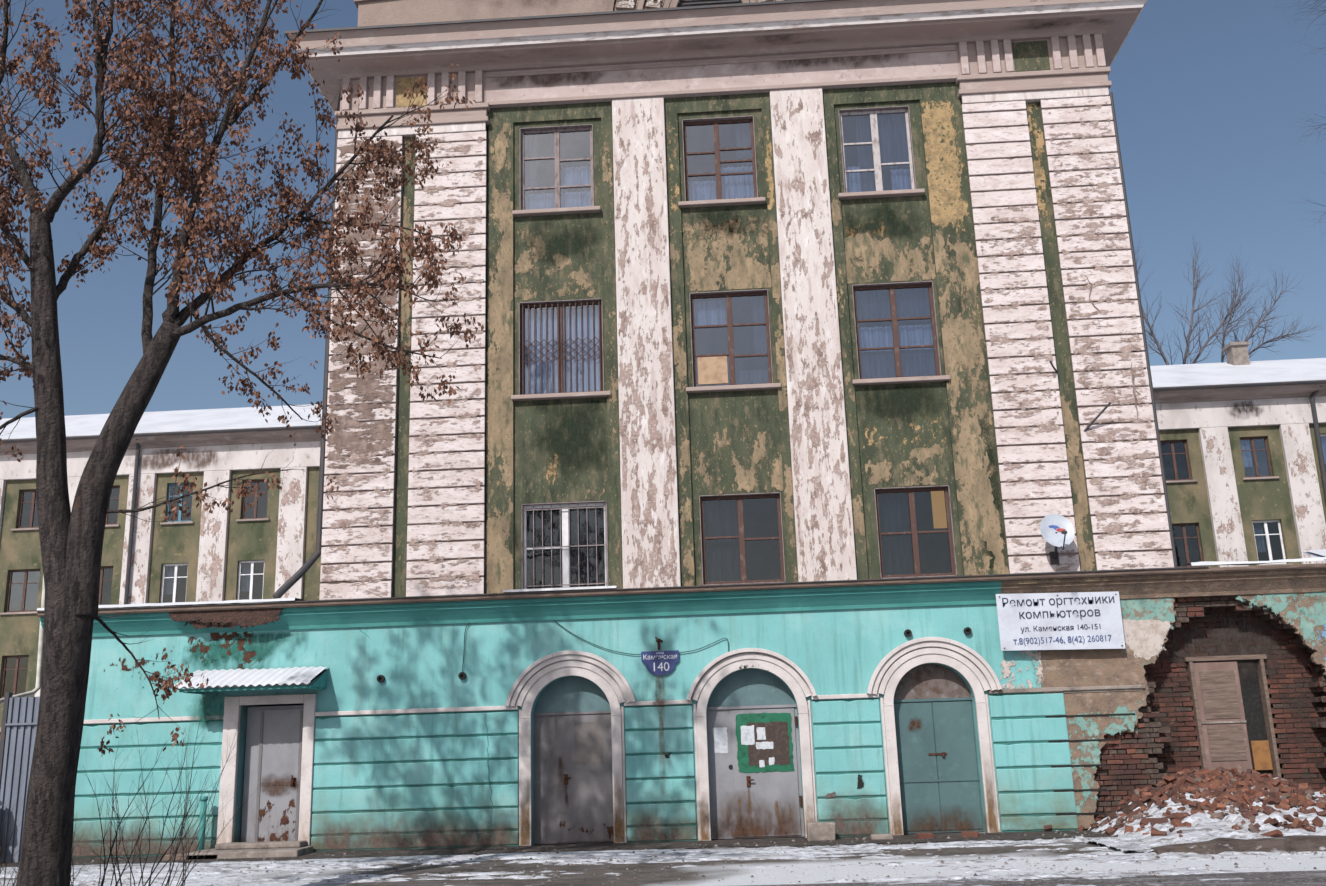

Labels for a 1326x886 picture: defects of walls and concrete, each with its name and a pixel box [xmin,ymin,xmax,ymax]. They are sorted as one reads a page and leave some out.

water stain [539,227,594,262]
water stain [848,205,912,236]
peeling [602,92,1169,588]
water stain [538,401,603,468]
water stain [192,634,288,668]
water stain [194,691,224,727]
flaking render [1052,592,1326,831]
corrosion [258,779,297,842]